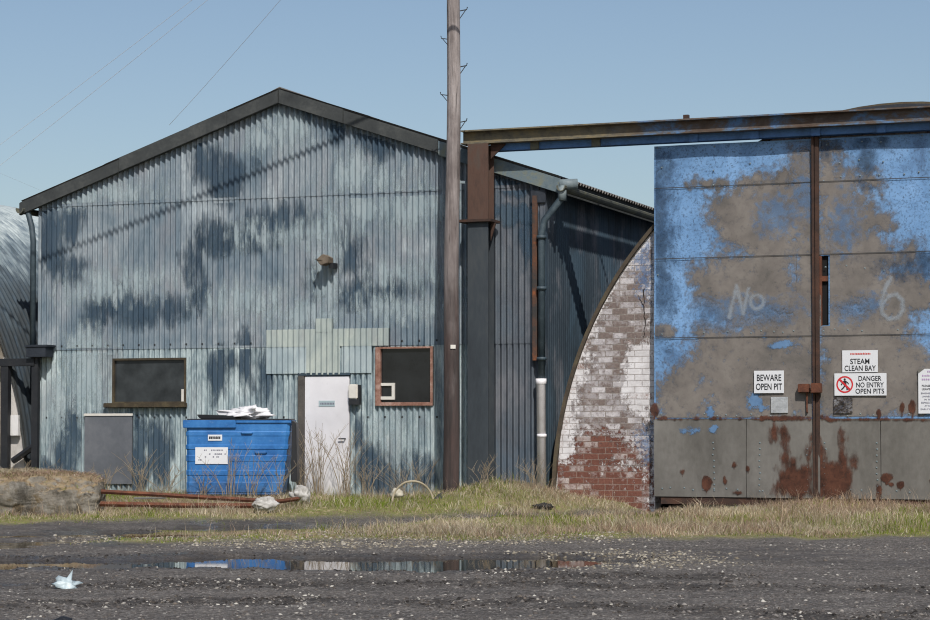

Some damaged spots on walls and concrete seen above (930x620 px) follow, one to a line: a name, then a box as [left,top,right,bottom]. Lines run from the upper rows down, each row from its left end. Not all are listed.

damp [237,108,314,162]
damp [62,177,169,211]
damp [208,148,445,329]
damp [67,265,165,307]
peeling [558,140,930,511]
damp [51,324,120,443]
damp [378,410,424,495]
rust [650,403,682,420]
rust [702,476,727,492]
rust [738,400,927,501]